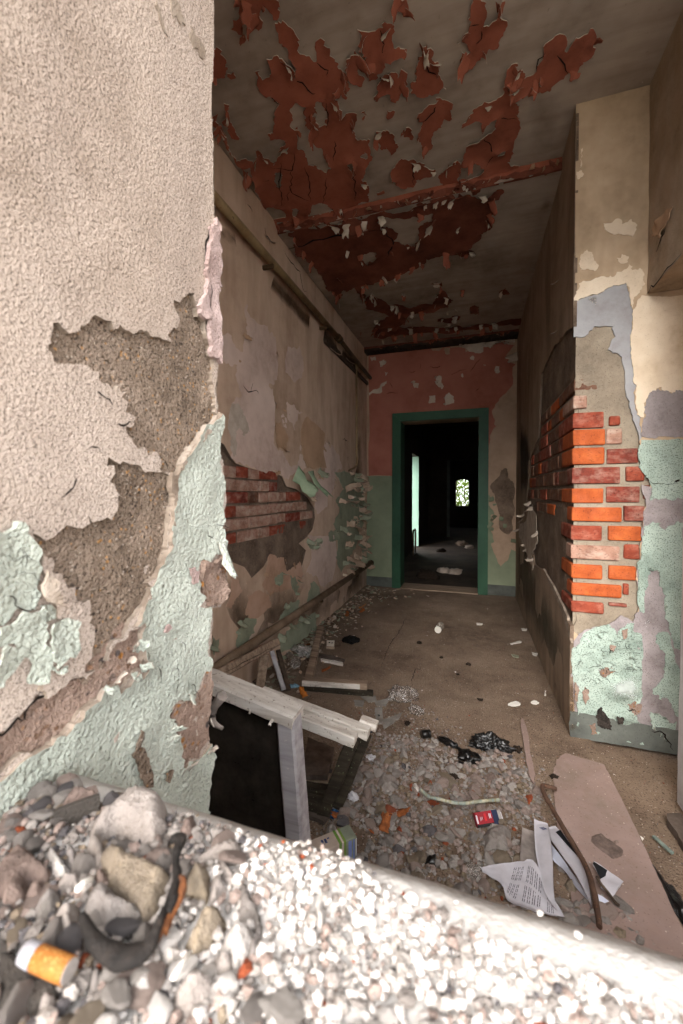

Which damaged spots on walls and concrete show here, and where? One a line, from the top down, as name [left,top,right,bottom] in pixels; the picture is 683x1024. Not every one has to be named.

peeling [0,217,375,819]
peeling [212,0,604,373]
spalling [428,375,454,405]
flaking render [487,327,683,741]